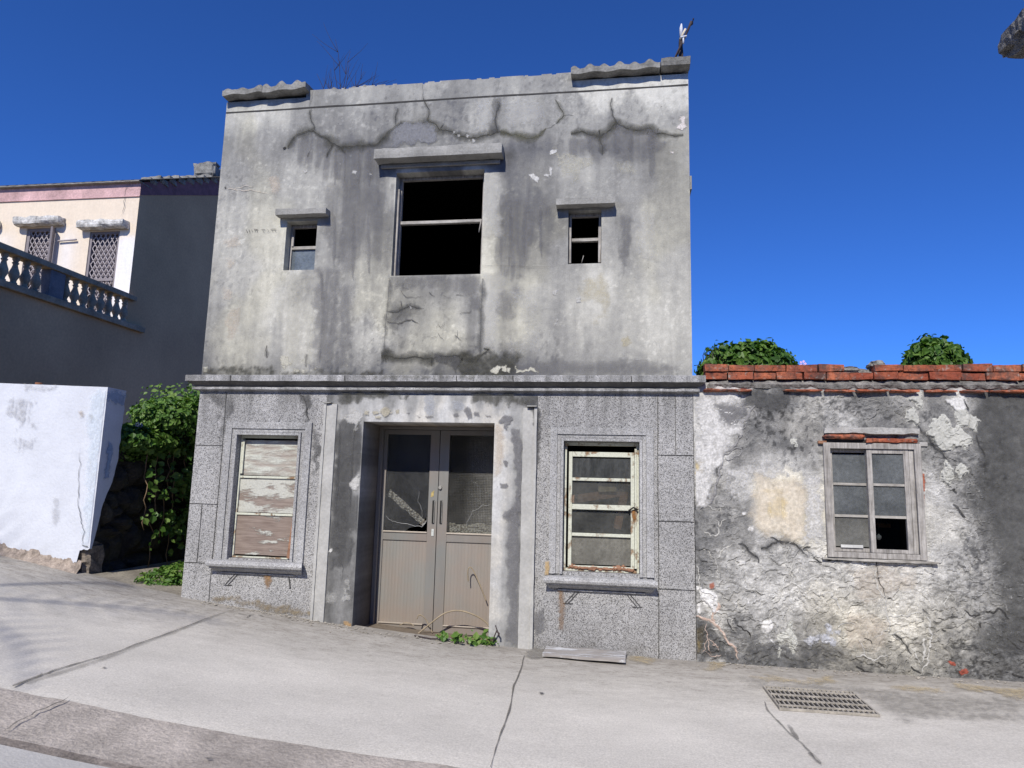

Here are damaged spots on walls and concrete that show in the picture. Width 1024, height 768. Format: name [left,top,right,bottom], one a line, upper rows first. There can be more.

crack [287,85,683,158]
crack [381,265,526,363]
leakage [331,419,361,566]
peeling [490,365,536,374]
leakage [503,428,523,642]
leakage [527,400,540,463]
peeling [695,388,743,507]
crack [696,394,764,660]
peeling [946,395,981,433]
crack [813,569,956,673]